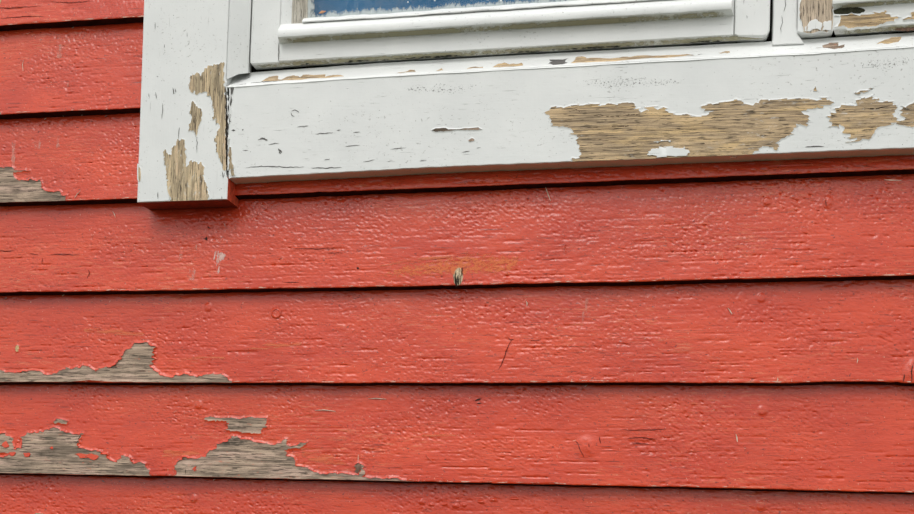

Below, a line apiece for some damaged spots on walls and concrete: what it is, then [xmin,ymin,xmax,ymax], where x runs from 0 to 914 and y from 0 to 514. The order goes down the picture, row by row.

peeling [798,0,914,50]
peeling [162,61,236,201]
peeling [544,85,914,162]
peeling [0,163,69,202]
peeling [0,339,233,383]
peeling [0,416,152,476]
peeling [172,414,407,481]